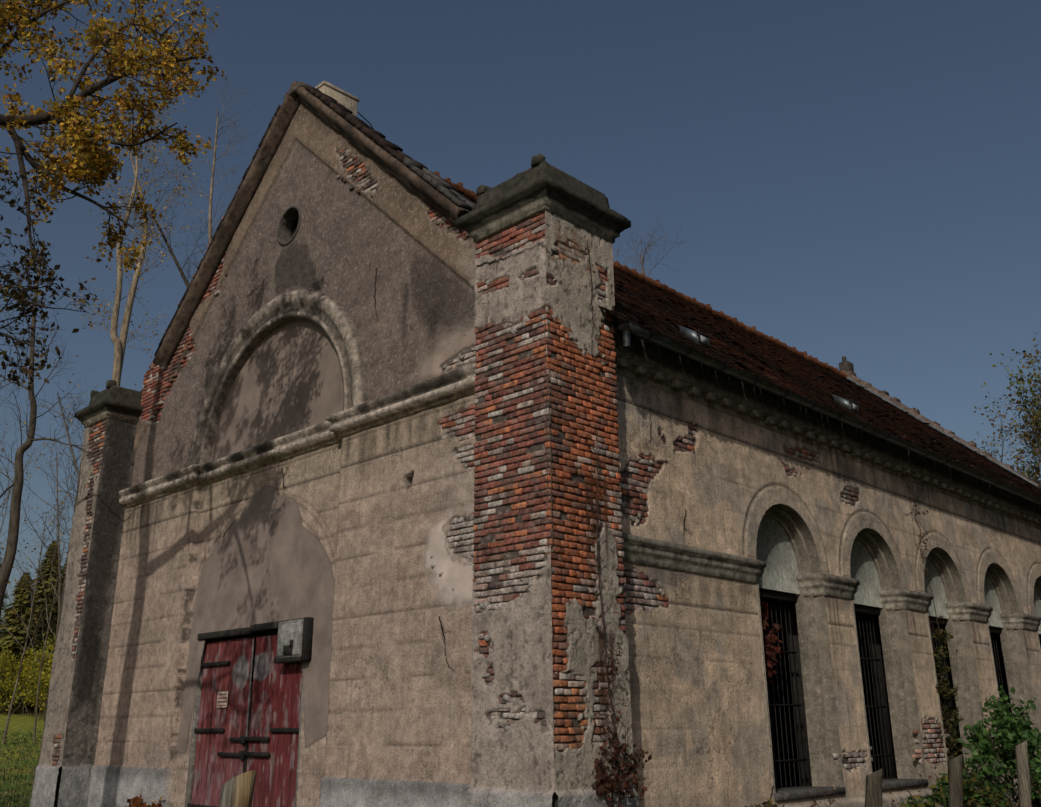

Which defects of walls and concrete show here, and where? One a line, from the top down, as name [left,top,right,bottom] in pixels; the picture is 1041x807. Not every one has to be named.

spalling [336,148,379,197]
spalling [196,253,228,311]
spalling [140,324,196,427]
spalling [407,203,698,750]
spalling [71,418,107,659]
spalling [912,716,950,767]